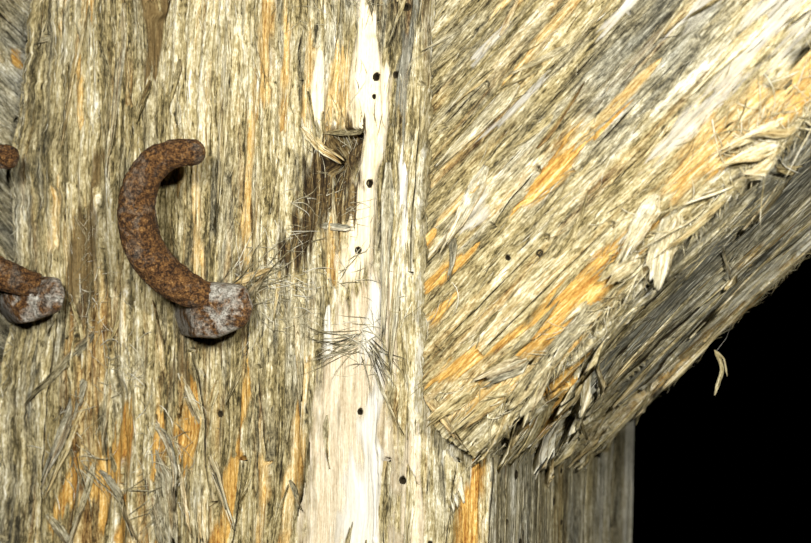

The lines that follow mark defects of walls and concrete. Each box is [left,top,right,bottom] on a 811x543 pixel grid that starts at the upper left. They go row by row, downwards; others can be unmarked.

crack [0,97,17,123]